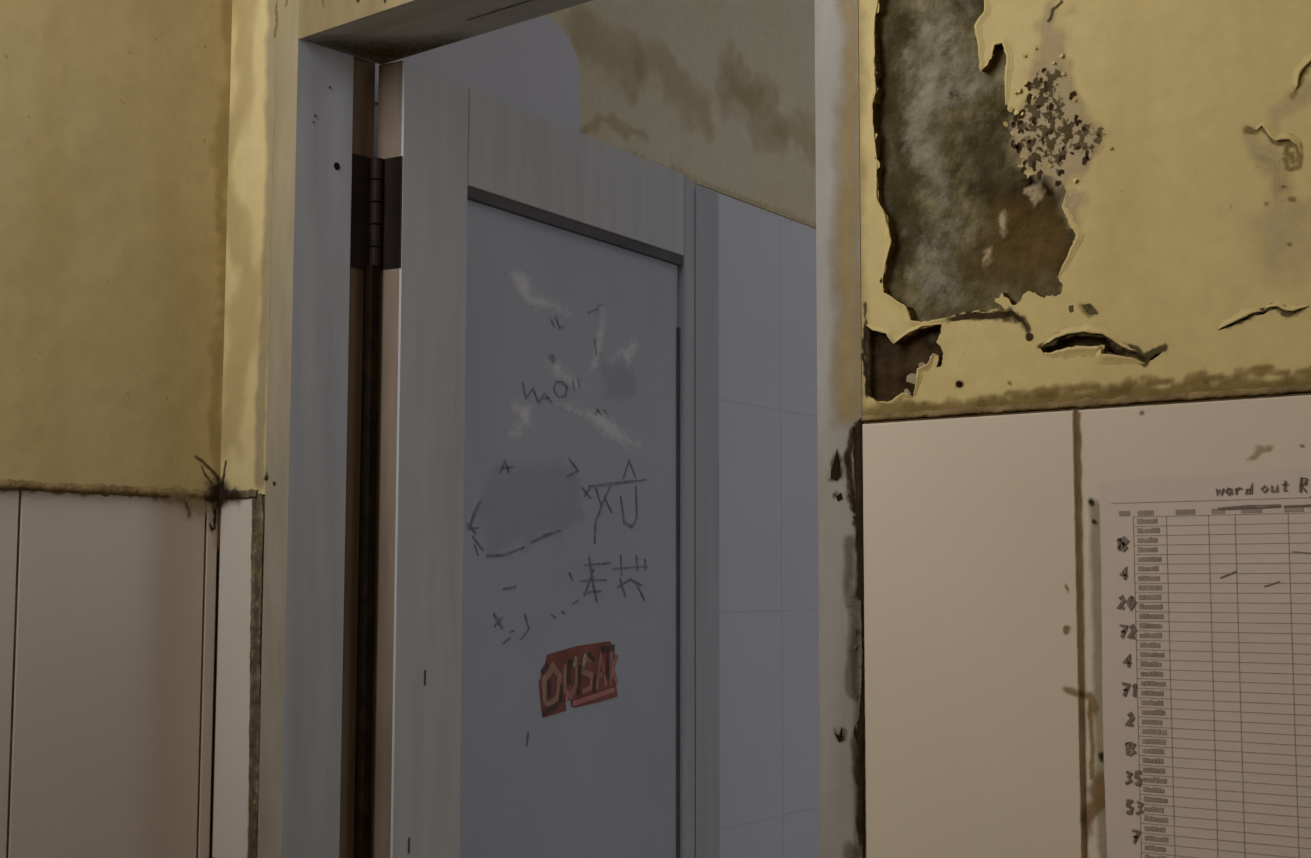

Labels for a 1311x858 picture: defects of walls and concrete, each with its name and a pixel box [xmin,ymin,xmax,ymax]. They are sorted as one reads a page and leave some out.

flaking render [861,0,1112,405]
crack [947,308,1167,367]
crack [1218,301,1308,330]
leakage [843,365,1311,858]